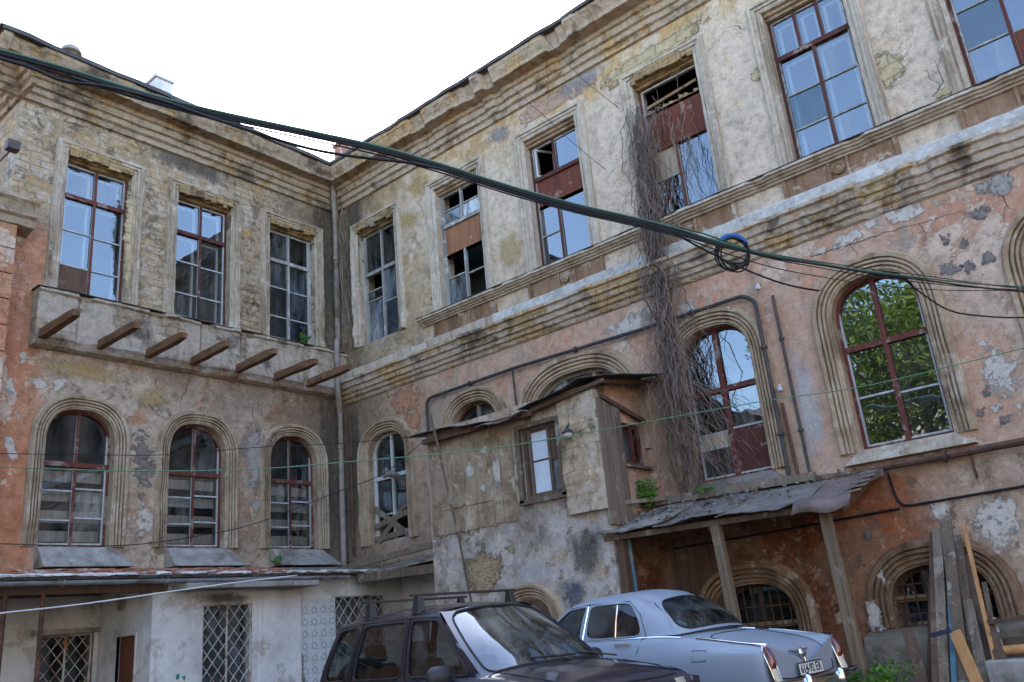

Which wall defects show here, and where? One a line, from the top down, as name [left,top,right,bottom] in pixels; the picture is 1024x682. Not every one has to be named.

flaking render [875,49,910,89]
flaking render [965,173,1014,221]
flaking render [939,233,996,276]
flaking render [976,339,1023,425]
flaking render [2,433,18,461]
flaking render [130,427,156,538]
flaking render [927,493,950,520]
flaking render [969,490,1022,554]
flaking render [463,545,515,598]
flaking render [865,600,887,633]